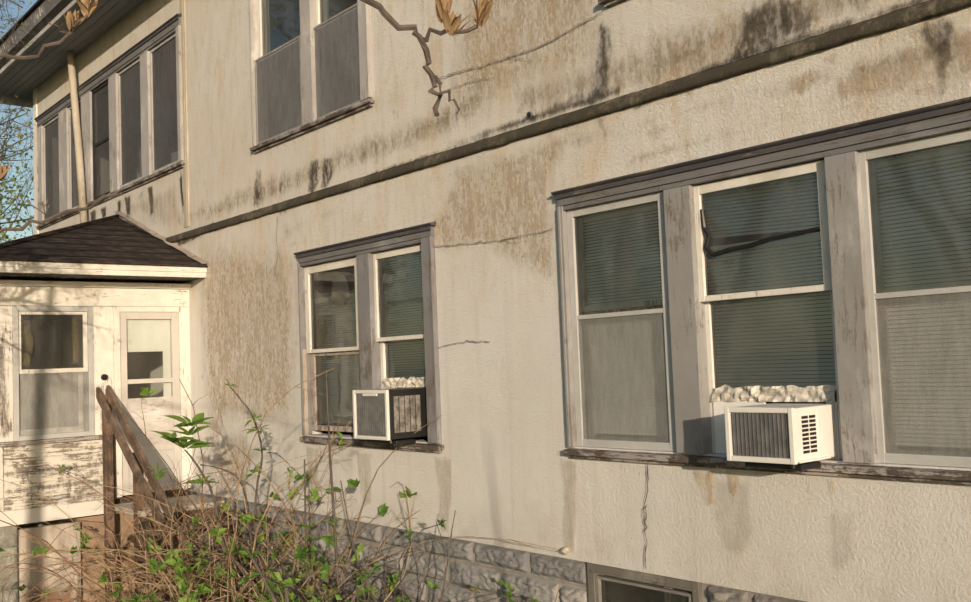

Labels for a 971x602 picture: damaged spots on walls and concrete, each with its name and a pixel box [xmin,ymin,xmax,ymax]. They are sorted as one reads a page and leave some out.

leakage [700,0,852,73]
leakage [923,19,952,76]
leakage [255,159,333,200]
peeling [0,346,9,436]
crack [642,465,650,569]